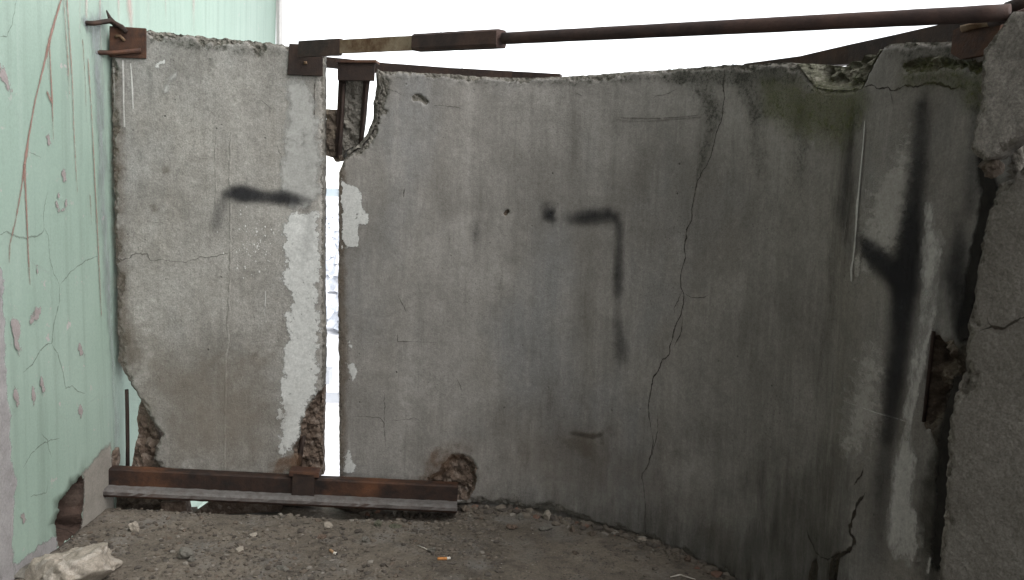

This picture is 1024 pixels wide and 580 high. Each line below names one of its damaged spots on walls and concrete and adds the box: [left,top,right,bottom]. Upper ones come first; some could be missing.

spalling [336,69,383,157]
leakage [648,62,811,132]
crack [641,66,725,537]
peeling [921,243,940,305]
spalling [278,384,326,475]
spalling [920,330,967,445]
flaking render [55,445,115,547]
spalling [426,454,477,500]
crack [807,470,866,580]